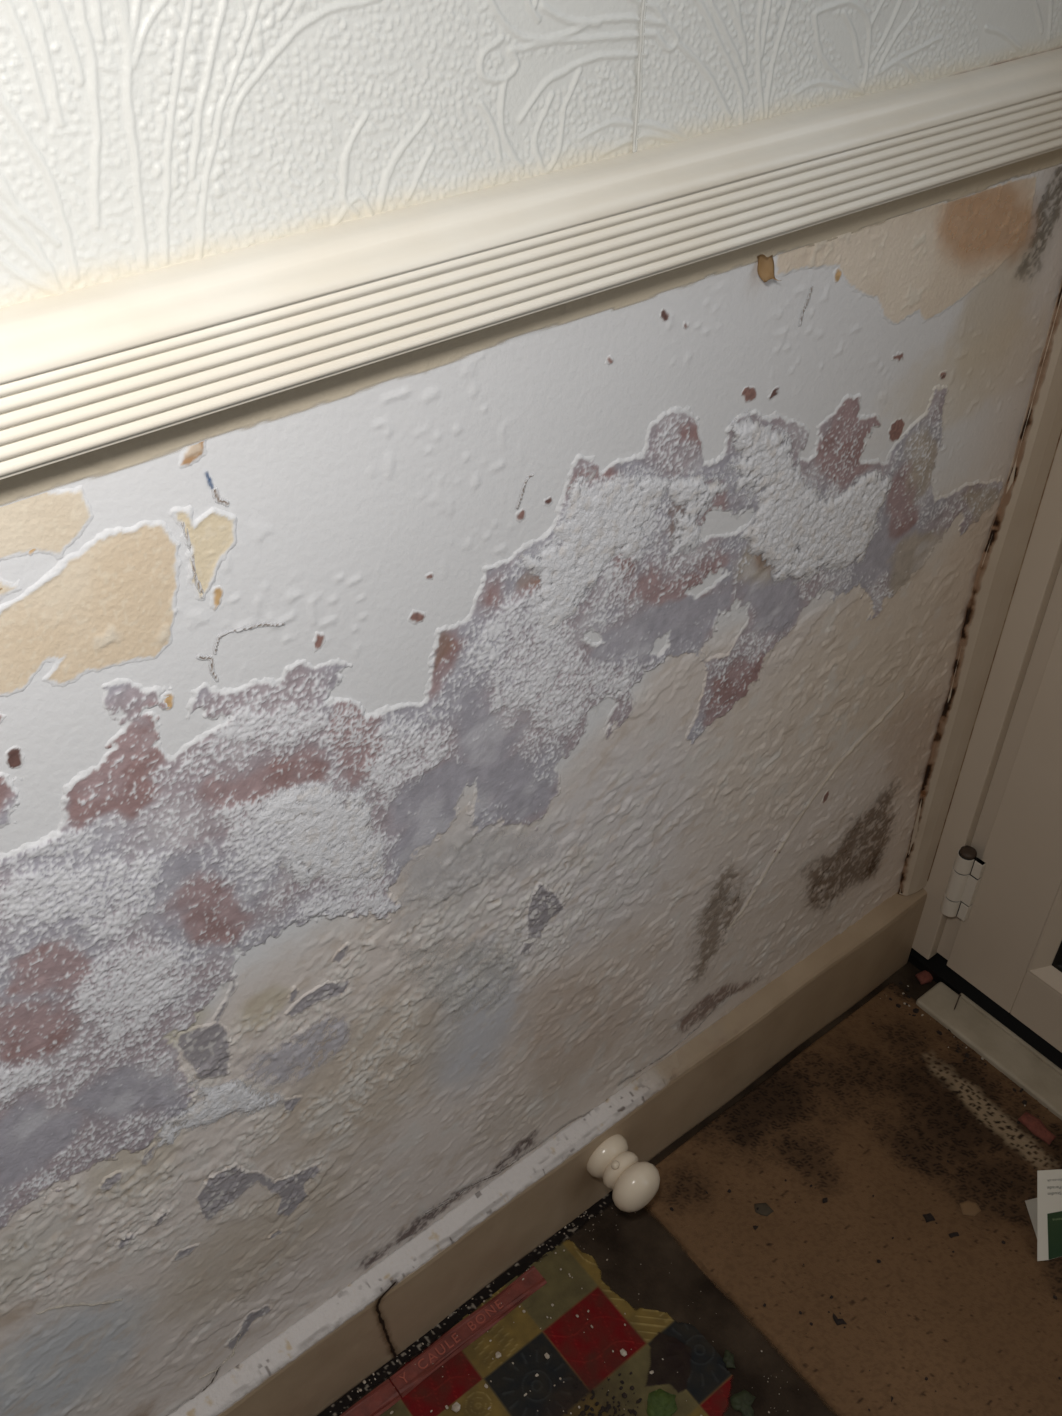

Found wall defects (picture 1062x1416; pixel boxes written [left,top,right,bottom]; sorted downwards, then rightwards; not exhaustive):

peeling [0,370,1005,1230]
damp [811,793,891,902]
damp [698,875,737,973]
damp [681,983,749,1029]
damp [156,1018,348,1148]
damp [167,1065,671,1416]
peeling [224,1304,273,1351]